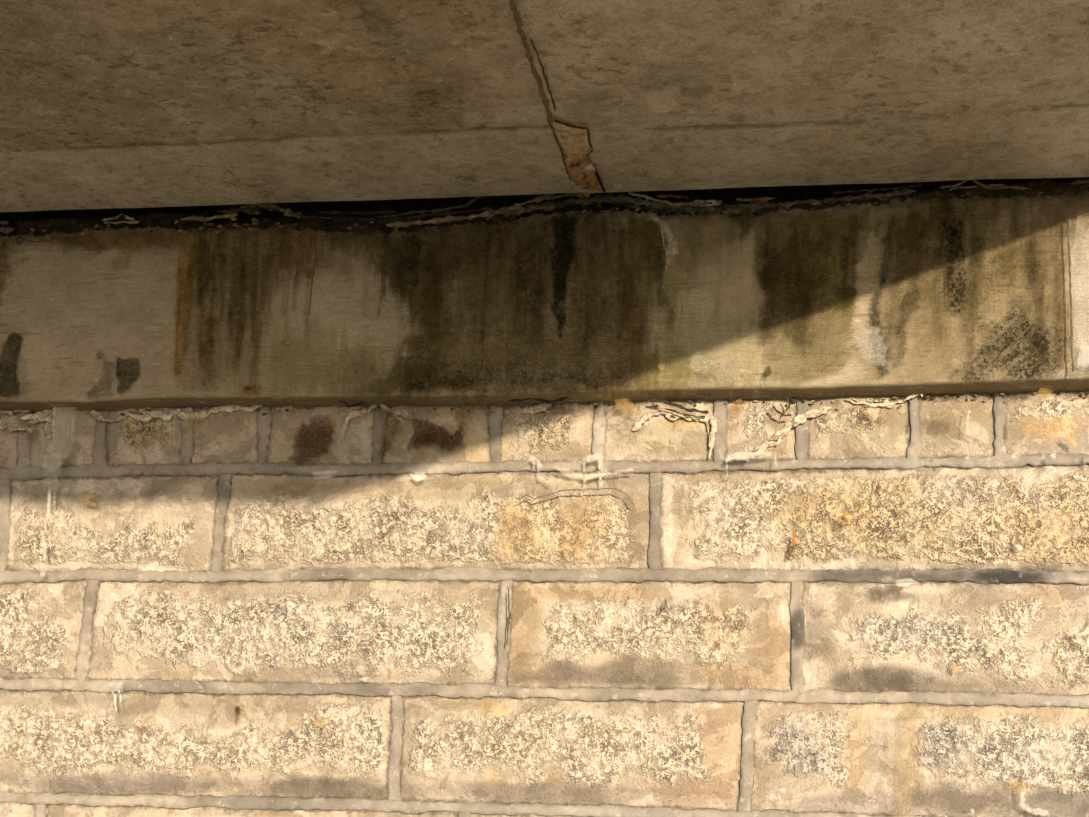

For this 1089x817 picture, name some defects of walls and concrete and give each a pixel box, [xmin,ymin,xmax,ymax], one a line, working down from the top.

crack [547,117,605,192]
rust [174,236,196,376]
leakage [53,170,1089,399]
leakage [0,332,22,399]
efflorescence [726,452,776,476]